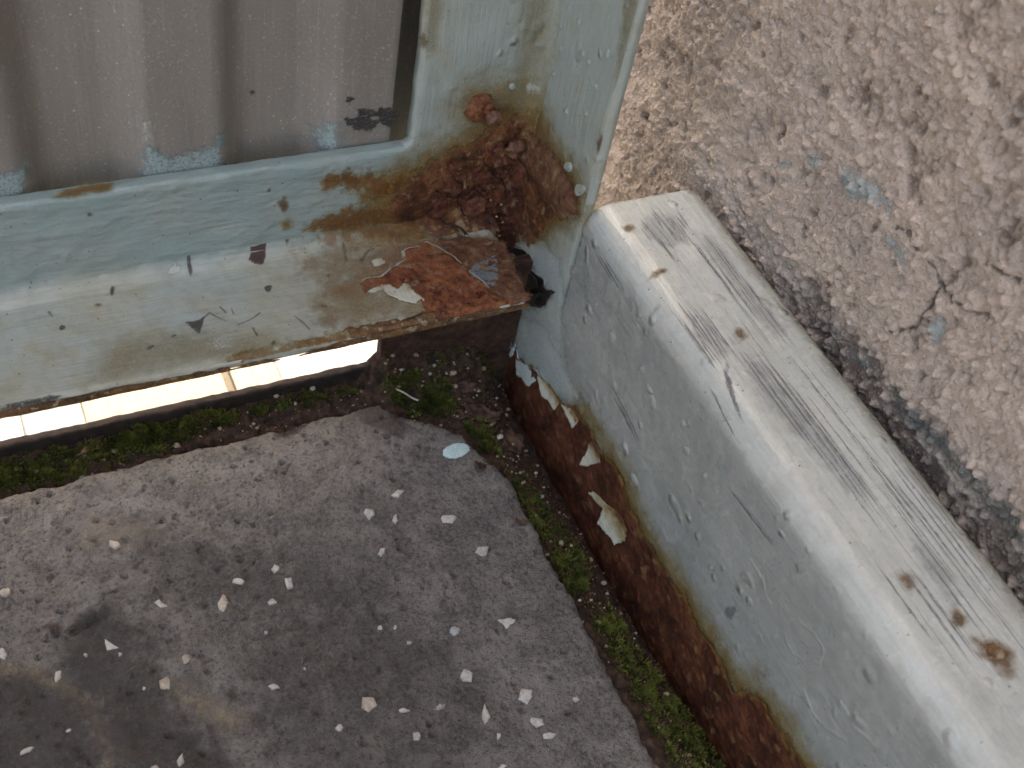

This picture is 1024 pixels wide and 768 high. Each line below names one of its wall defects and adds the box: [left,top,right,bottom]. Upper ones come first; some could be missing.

corrosion [55,183,112,198]
corrosion [303,81,587,250]
peeling [356,236,579,428]
peeling [579,440,601,467]
peeling [589,491,628,546]
corrosion [504,347,816,768]
corrosion [973,638,1013,677]